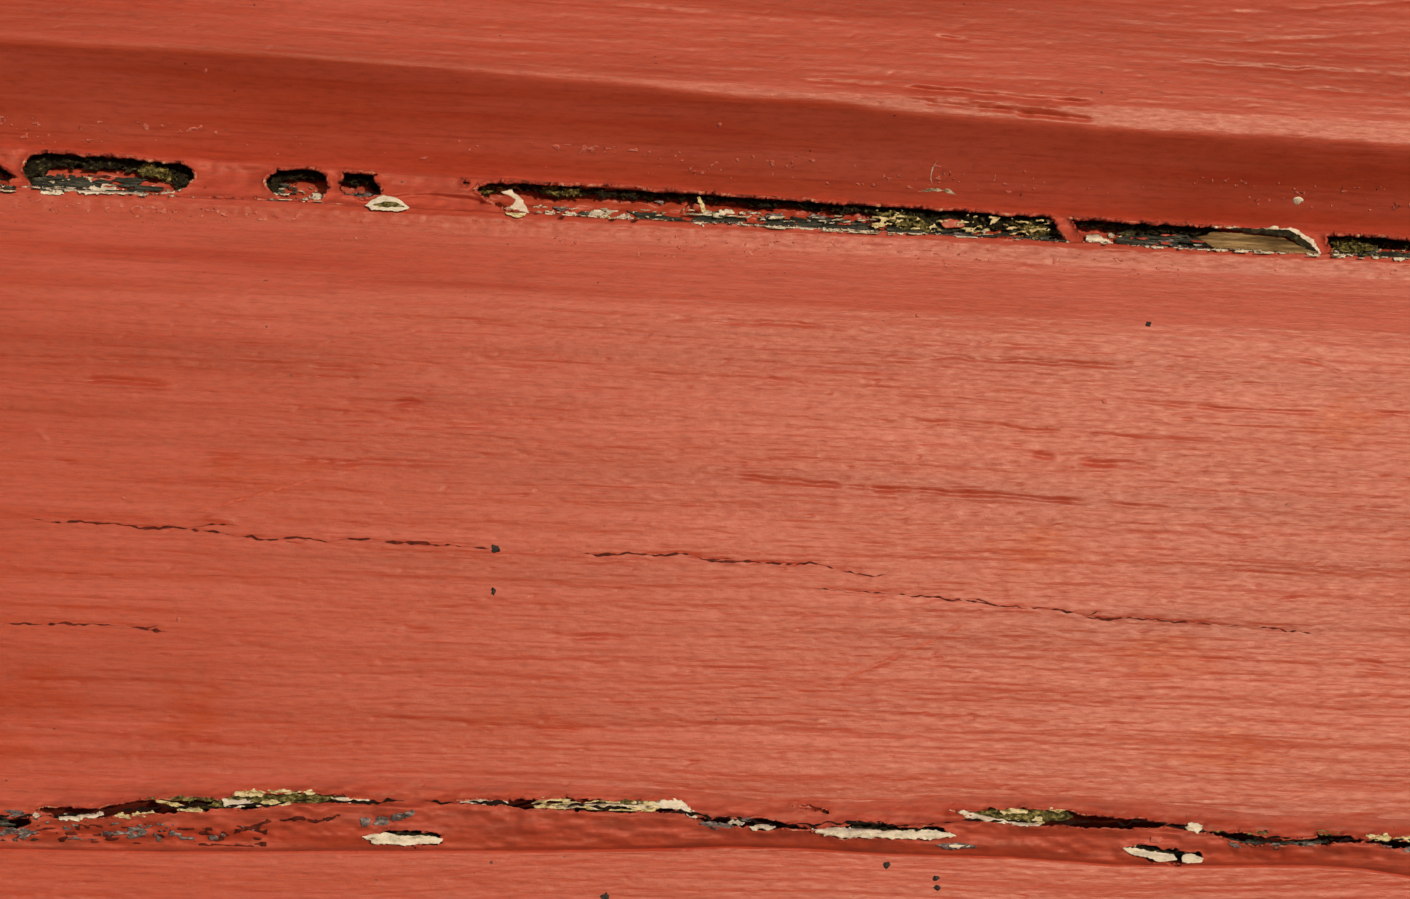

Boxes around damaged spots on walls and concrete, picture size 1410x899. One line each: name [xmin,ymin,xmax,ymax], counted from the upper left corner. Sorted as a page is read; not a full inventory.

peeling [0,153,194,198]
peeling [266,169,409,212]
peeling [477,183,1410,261]
crack [32,518,487,549]
crack [578,551,1313,634]
crack [1,621,166,633]
peeling [37,821,267,847]